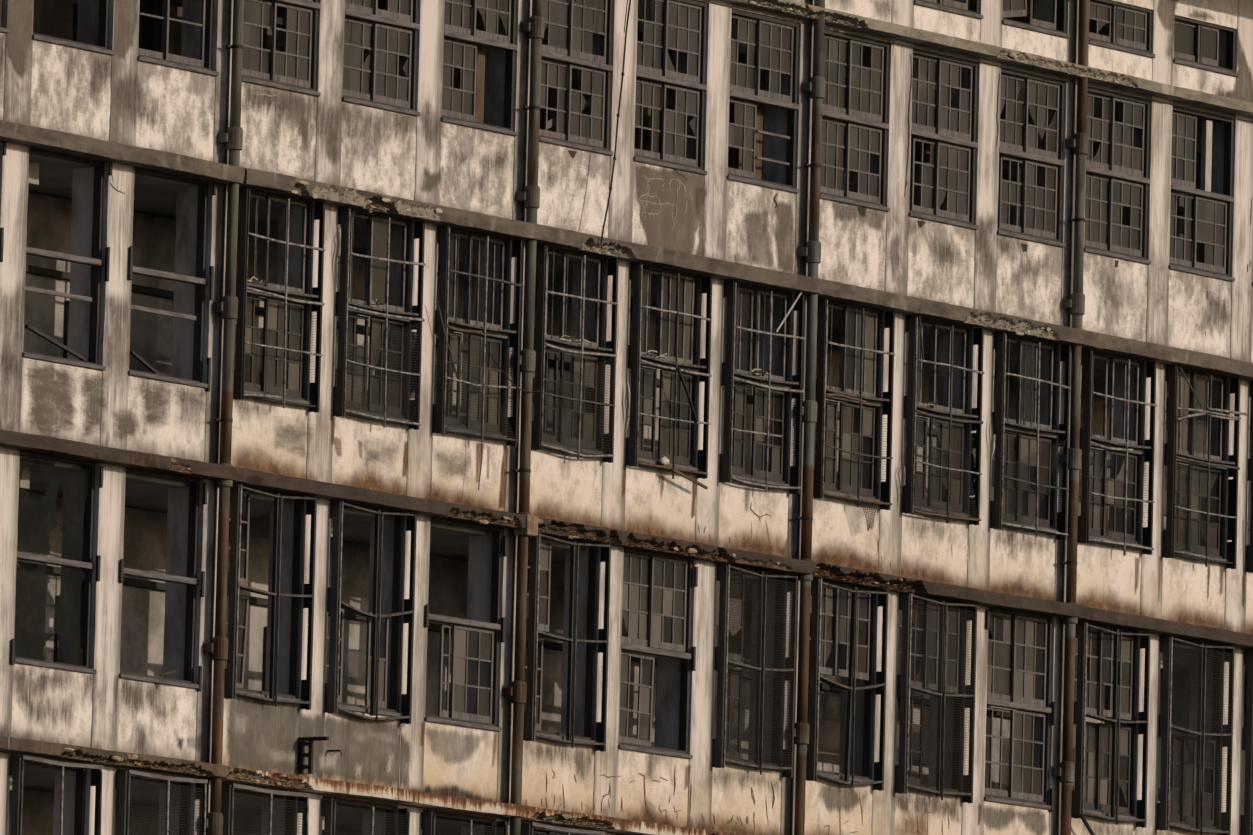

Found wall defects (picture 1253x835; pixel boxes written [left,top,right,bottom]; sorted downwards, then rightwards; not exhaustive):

water stain [248,87,409,162]
water stain [639,175,706,256]
water stain [1209,295,1227,329]
rust [332,416,341,455]
rust [347,442,408,496]
rust [438,443,483,481]
rust [499,447,508,508]
rust [426,489,483,508]
water stain [16,671,67,720]
water stain [116,680,165,717]
rust [631,806,673,826]
water stain [893,789,958,820]